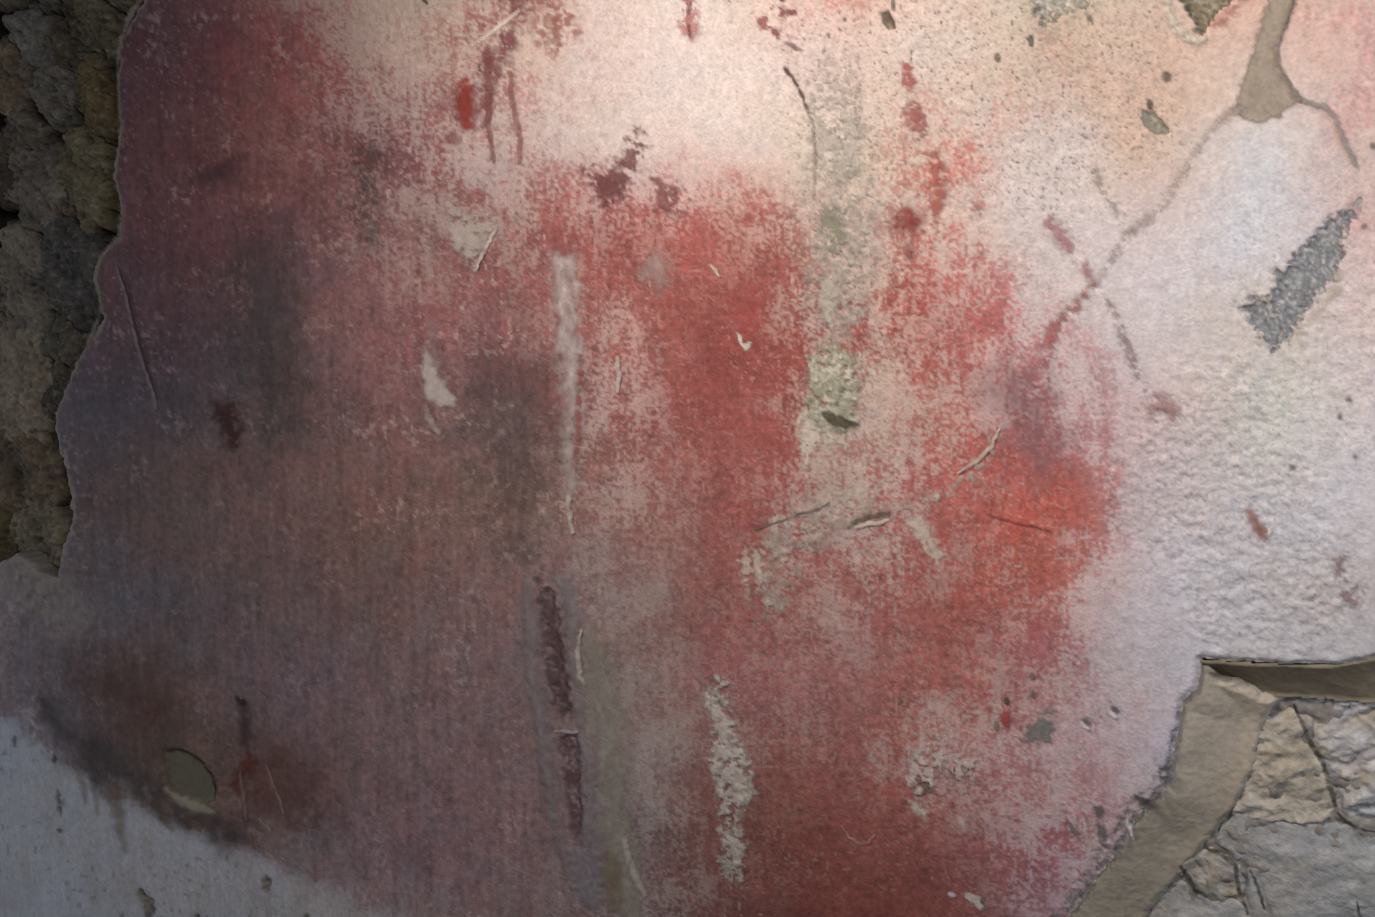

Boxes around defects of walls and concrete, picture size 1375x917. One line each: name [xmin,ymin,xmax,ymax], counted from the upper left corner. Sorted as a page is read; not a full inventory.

spalling [1028,0,1092,46]
spalling [1161,0,1236,45]
spalling [0,0,144,568]
crack [1040,0,1357,420]
spalling [1238,197,1366,353]
spalling [1052,657,1375,917]